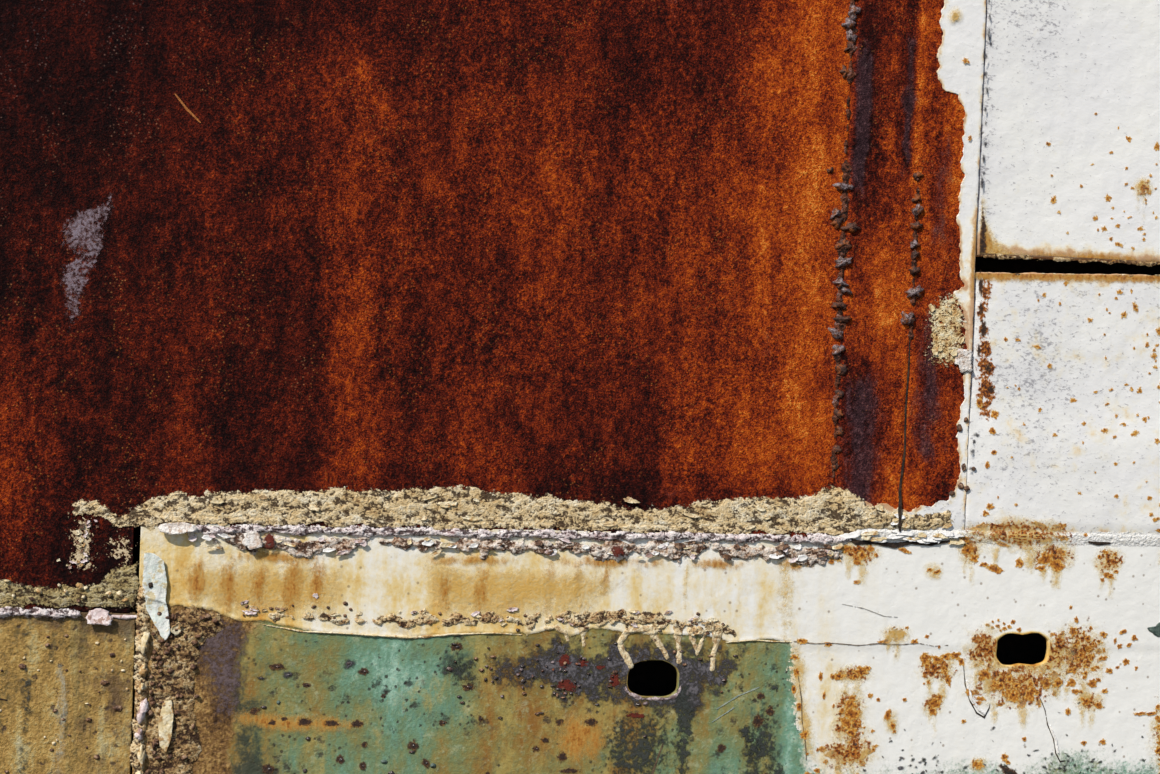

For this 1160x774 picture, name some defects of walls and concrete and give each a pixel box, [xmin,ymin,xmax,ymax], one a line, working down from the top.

corrosion [1125,142,1160,219]
peeling [924,293,974,373]
peeling [0,485,965,640]
corrosion [828,544,878,584]
corrosion [959,496,1088,584]
corrosion [1096,550,1123,585]
corrosion [877,605,1138,723]
corrosion [739,638,896,774]
corrosion [1133,704,1160,765]